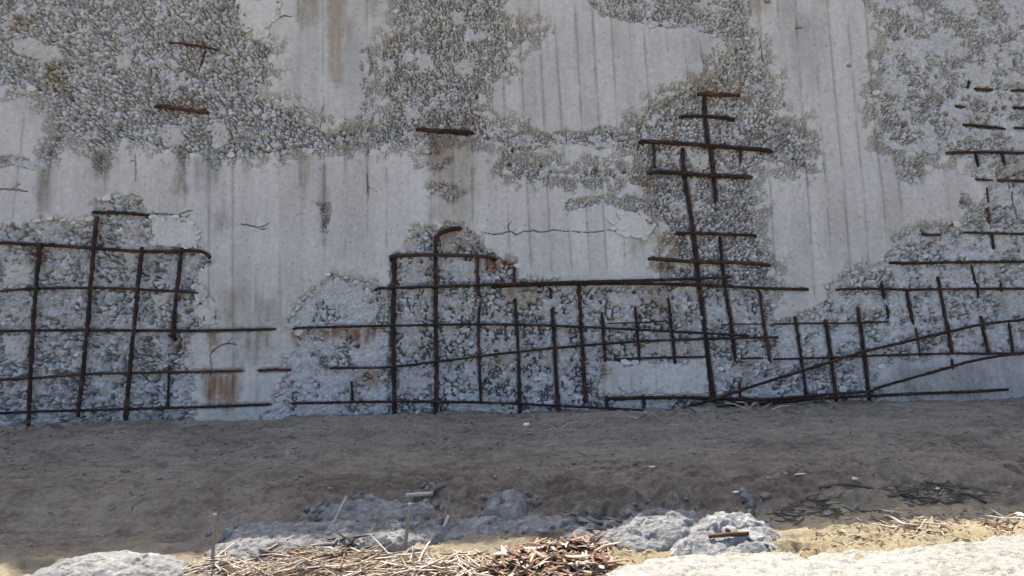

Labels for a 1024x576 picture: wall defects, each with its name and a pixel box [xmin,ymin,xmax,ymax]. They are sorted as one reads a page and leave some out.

spalling [2,0,286,150]
spalling [0,195,218,427]
crack [482,221,616,235]
spalling [262,0,1024,421]